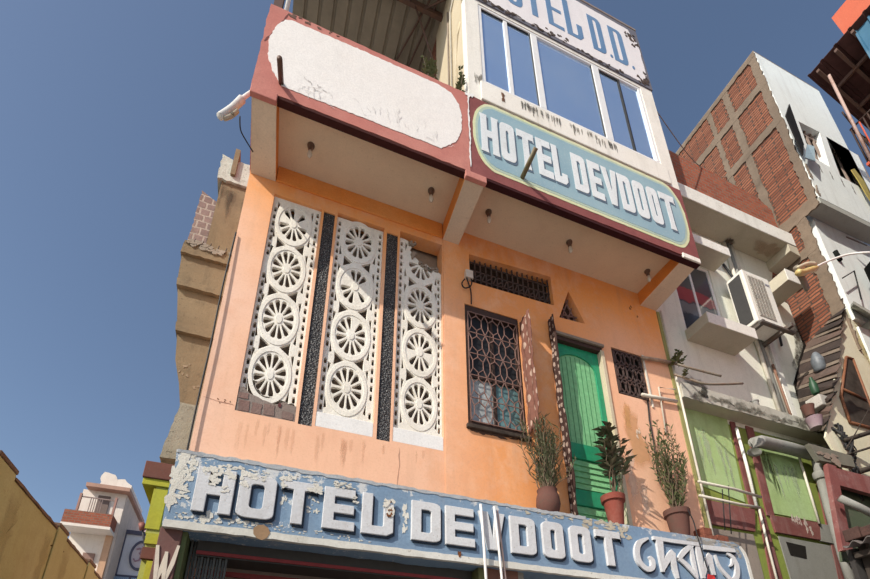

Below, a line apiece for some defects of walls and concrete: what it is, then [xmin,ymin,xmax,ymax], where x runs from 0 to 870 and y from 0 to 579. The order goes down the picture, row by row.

peeling [164,452,370,542]
peeling [383,498,409,533]
peeling [525,510,632,540]